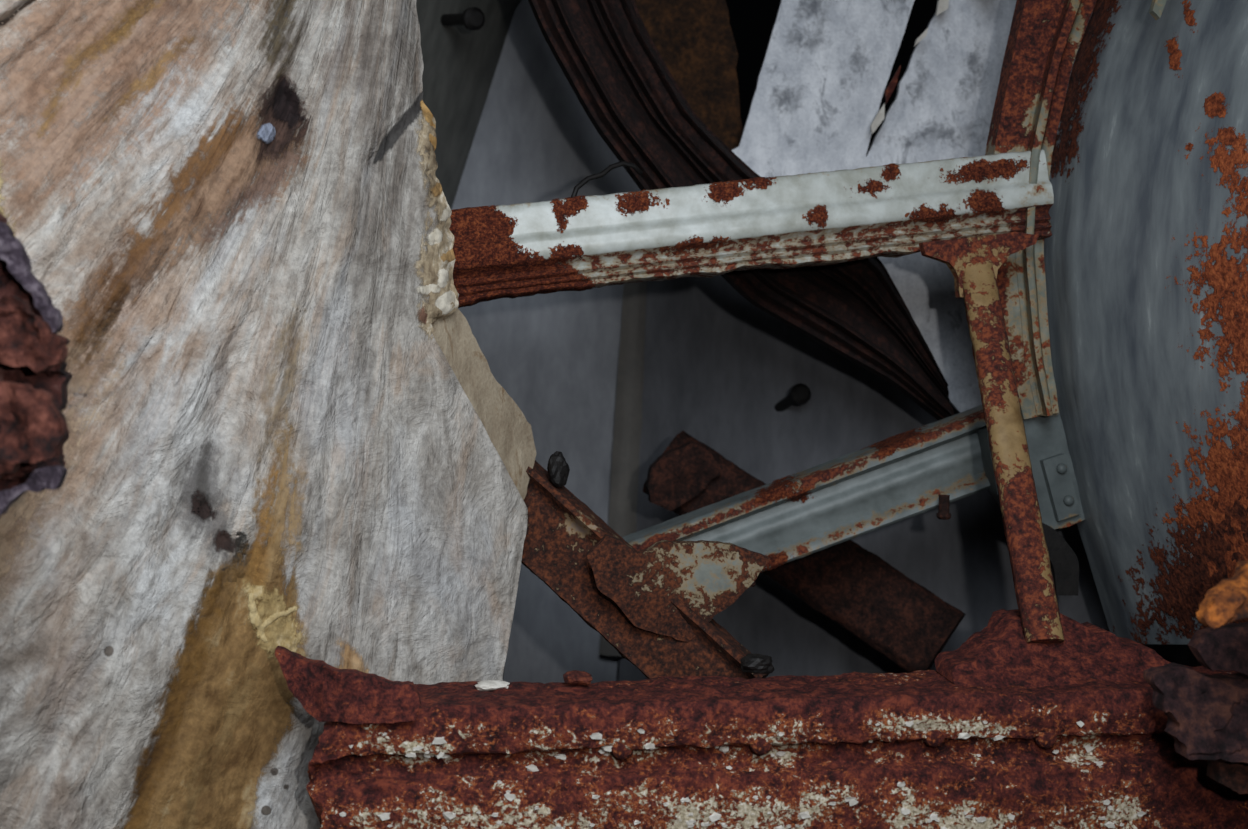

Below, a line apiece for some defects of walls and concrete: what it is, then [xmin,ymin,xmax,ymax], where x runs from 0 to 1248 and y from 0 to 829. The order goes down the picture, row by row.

corrosion [1164,0,1198,79]
corrosion [900,0,1123,226]
corrosion [615,190,670,217]
corrosion [704,177,776,207]
corrosion [802,204,828,230]
corrosion [844,163,901,199]
corrosion [449,195,596,308]
corrosion [646,235,745,261]
corrosion [1113,92,1248,645]
corrosion [860,424,939,456]
corrosion [742,472,814,507]
corrosion [339,642,368,673]